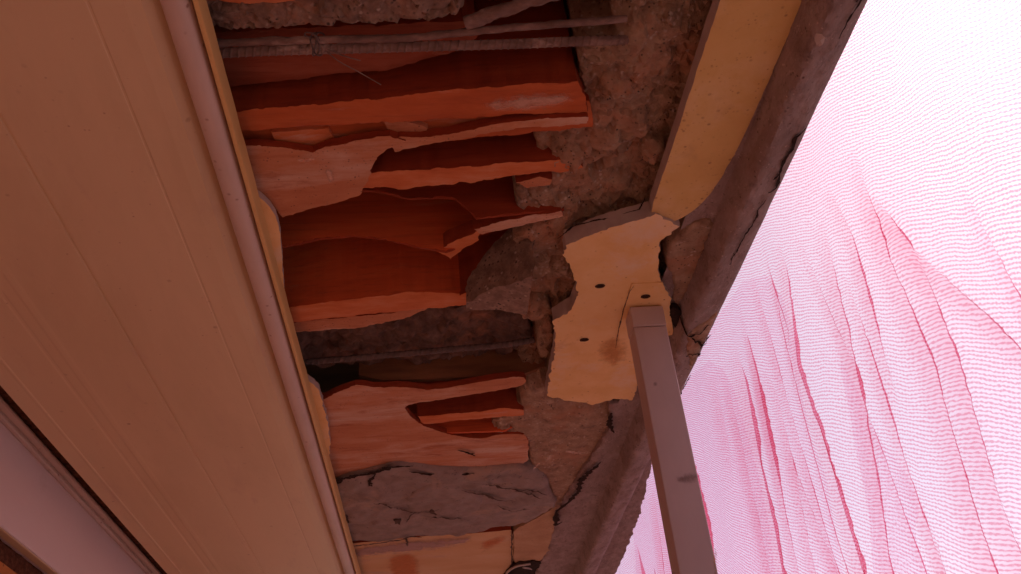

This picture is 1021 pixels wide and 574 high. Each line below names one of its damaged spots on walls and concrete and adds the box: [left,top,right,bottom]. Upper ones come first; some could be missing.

spalling [217,0,713,574]
flaking render [658,216,724,376]
crack [606,413,615,433]
crack [336,450,601,574]